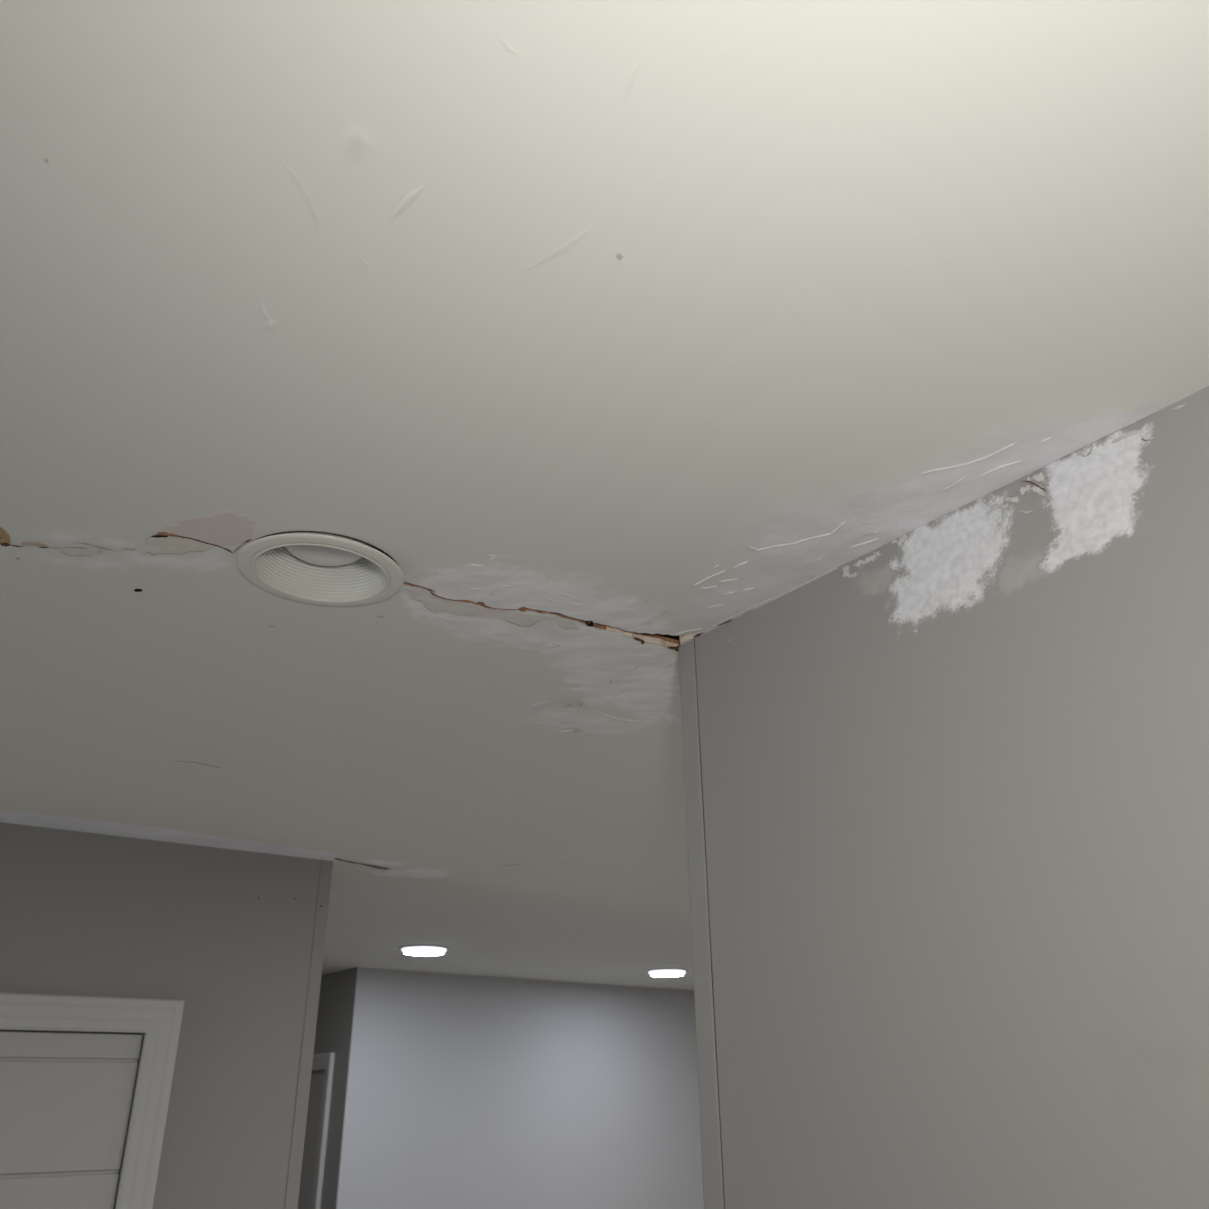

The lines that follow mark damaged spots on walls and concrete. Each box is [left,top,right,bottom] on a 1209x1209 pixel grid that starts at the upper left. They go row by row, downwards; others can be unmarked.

peeling [0,527,23,547]
crack [404,567,841,651]